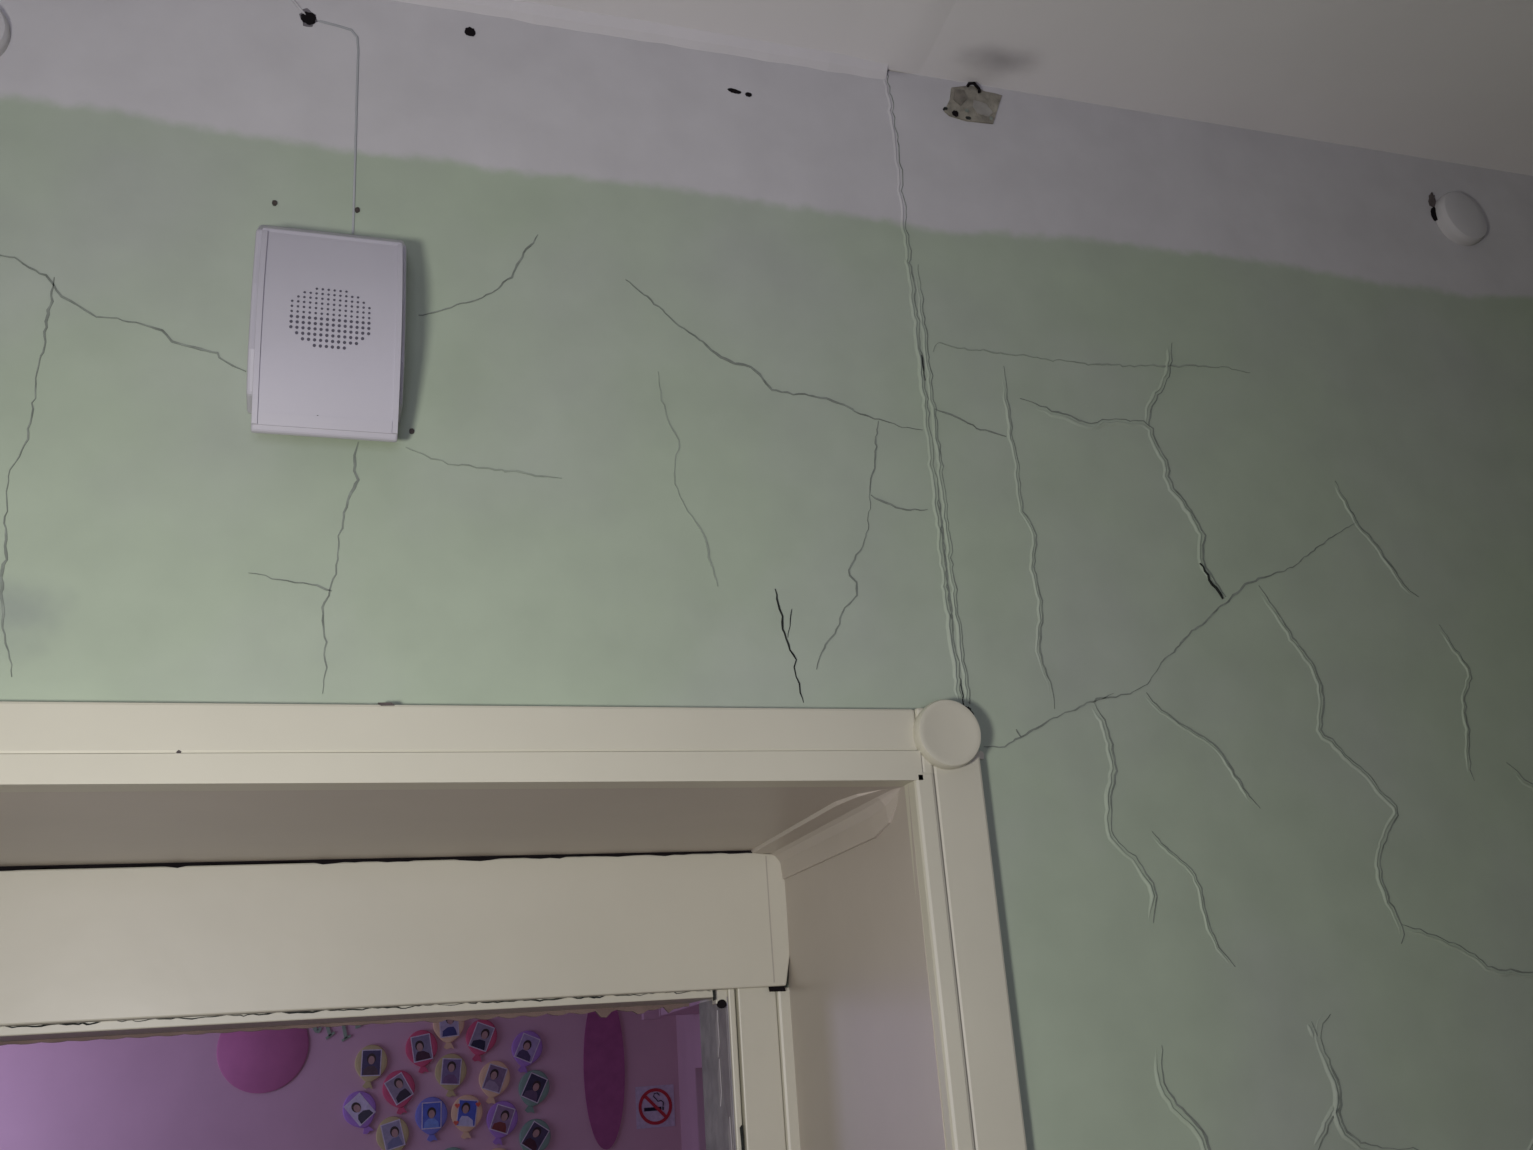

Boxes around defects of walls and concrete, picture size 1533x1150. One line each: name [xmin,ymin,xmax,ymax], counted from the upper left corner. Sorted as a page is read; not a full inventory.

crack [0,255,246,677]
crack [251,442,359,694]
crack [406,447,560,478]
crack [625,71,1533,979]
crack [1154,1045,1211,1150]
crack [1307,1012,1418,1150]